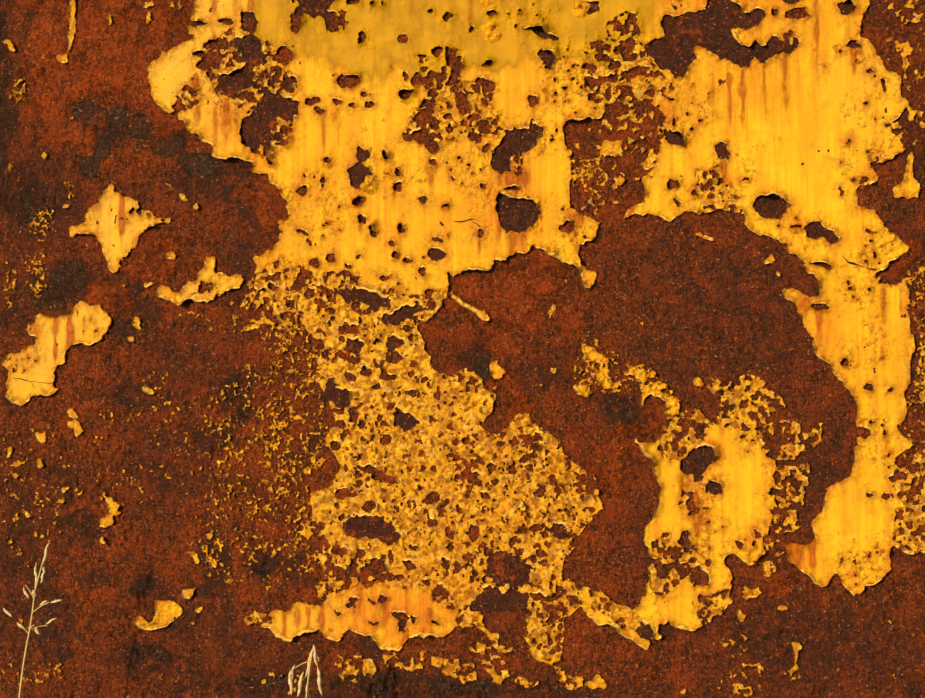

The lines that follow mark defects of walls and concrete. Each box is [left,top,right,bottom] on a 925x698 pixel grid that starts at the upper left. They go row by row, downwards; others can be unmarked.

rust [21,0,199,146]
rust [214,30,269,132]
rust [642,0,799,120]
rust [804,221,839,244]
peeling [489,360,506,379]
rust [680,445,722,536]
rust [469,549,533,615]
peeling [762,560,776,577]
peeling [334,653,377,683]
peeling [430,655,477,684]
peeling [717,635,764,697]
peeling [783,642,802,681]